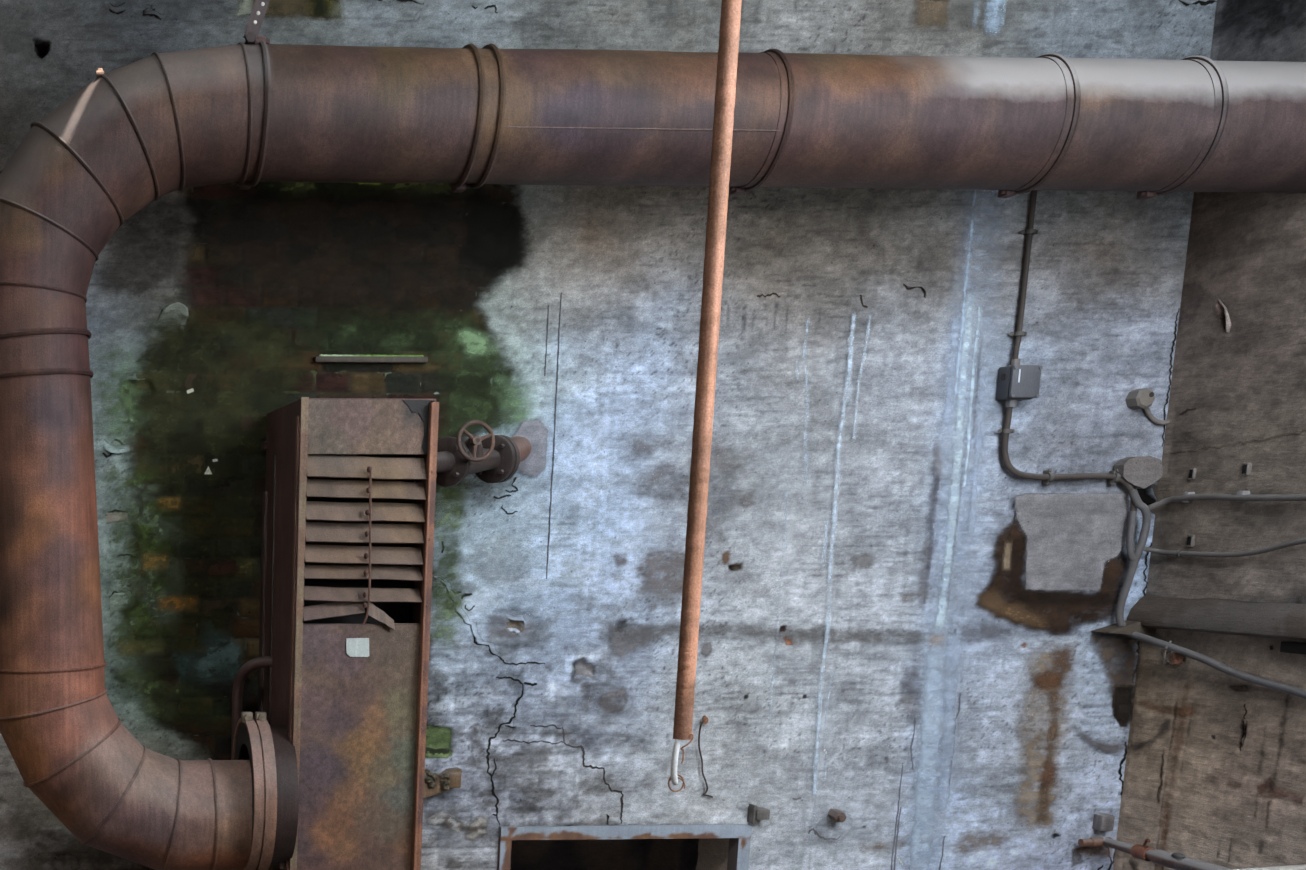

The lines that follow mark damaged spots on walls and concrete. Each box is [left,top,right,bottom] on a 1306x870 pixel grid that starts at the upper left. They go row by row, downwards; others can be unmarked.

flaking render [236,0,342,19]
water stain [105,208,186,293]
water stain [467,194,528,271]
mould [174,631,243,682]
crack [433,542,624,825]